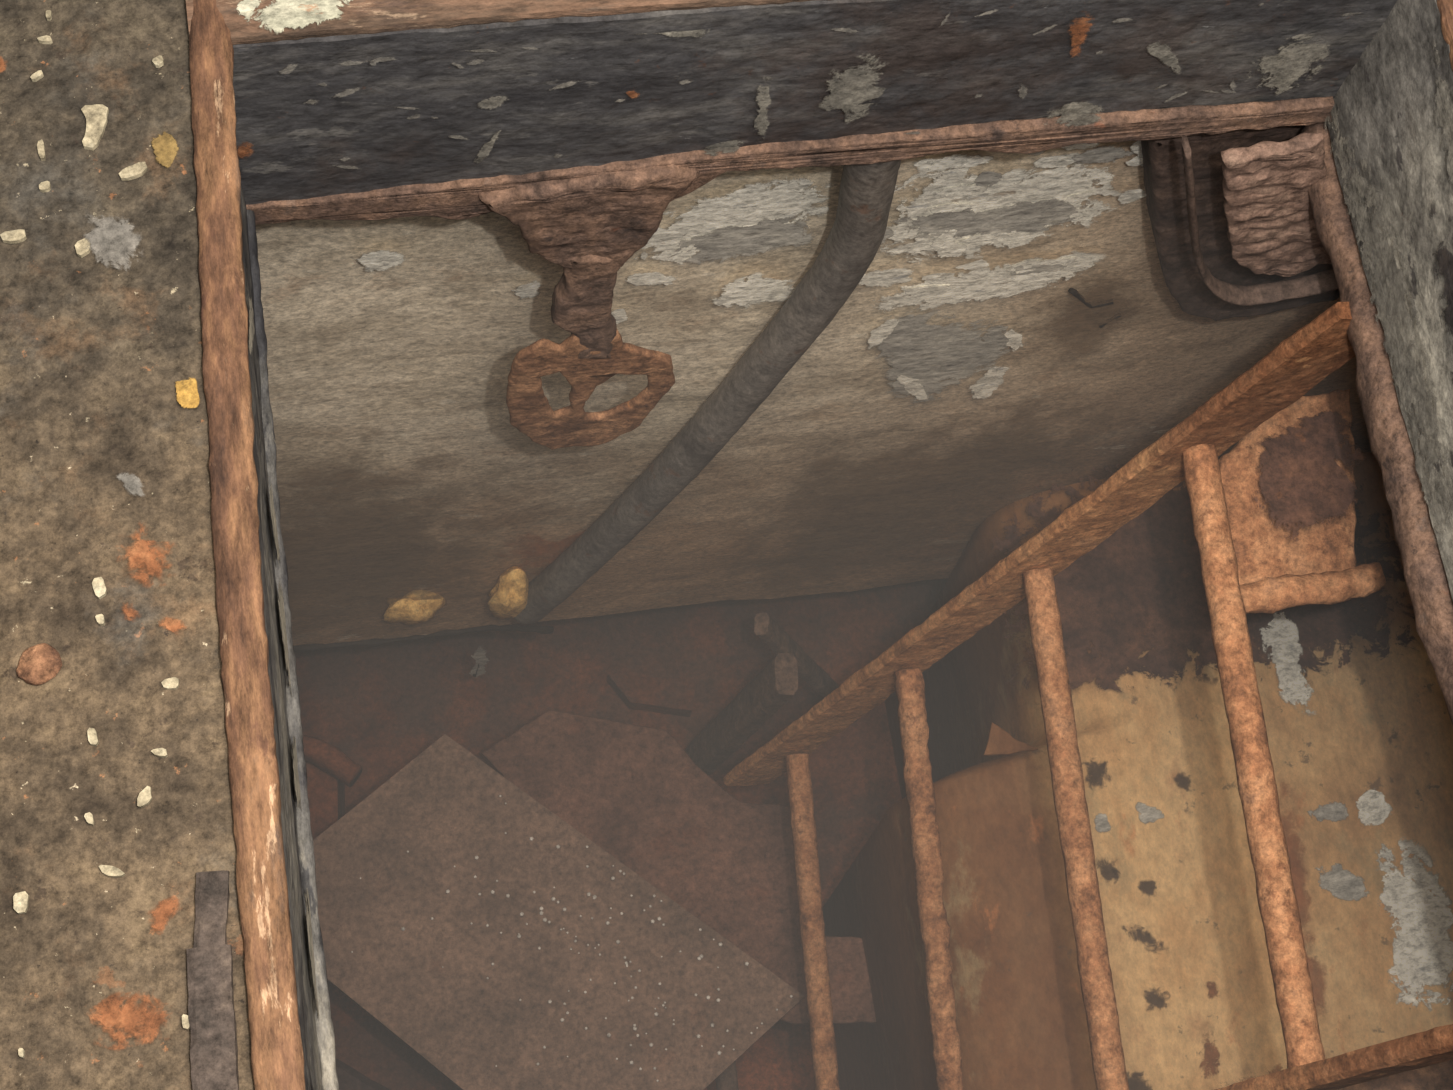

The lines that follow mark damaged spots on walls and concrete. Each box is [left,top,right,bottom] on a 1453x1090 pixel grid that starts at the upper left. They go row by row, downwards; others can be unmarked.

peeling [1259,612,1314,714]